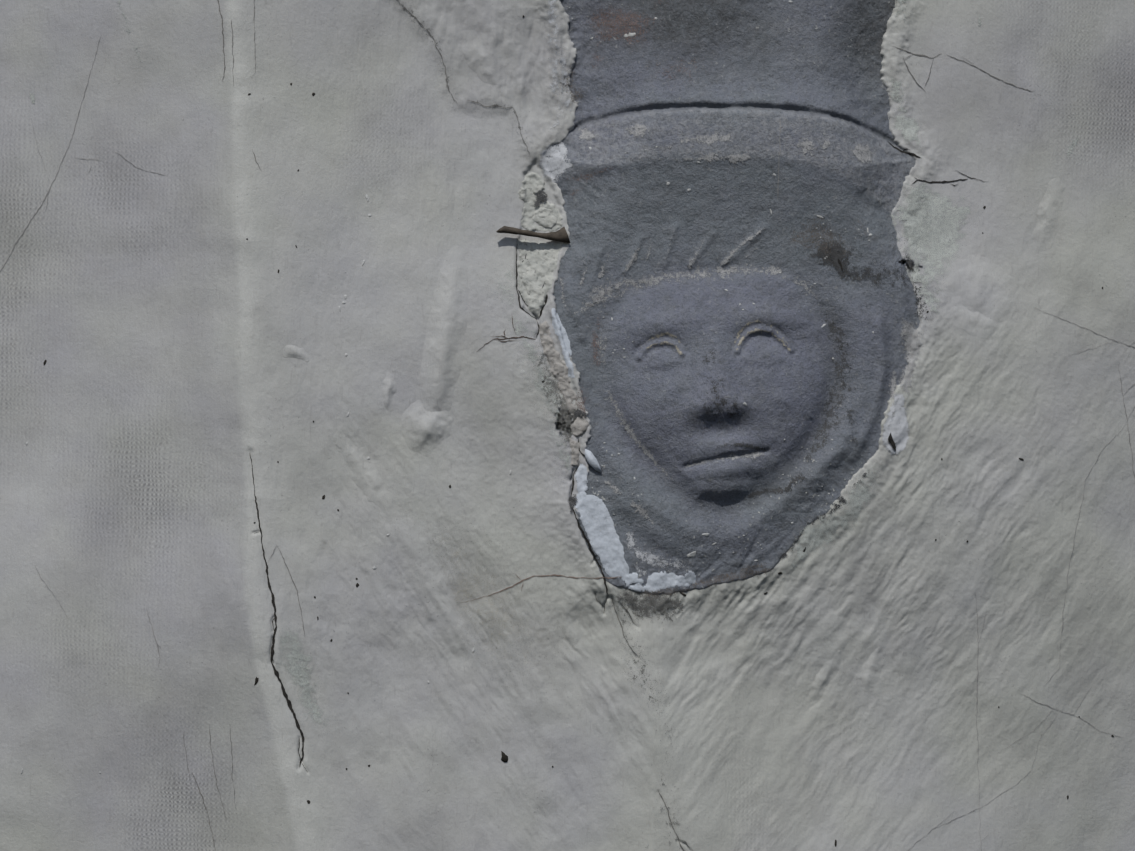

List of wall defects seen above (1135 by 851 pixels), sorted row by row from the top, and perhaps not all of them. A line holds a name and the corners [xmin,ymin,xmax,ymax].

crack [894,46,1030,91]
crack [889,143,989,186]
peeling [517,142,696,593]
peeling [882,318,924,455]
crack [250,456,307,771]